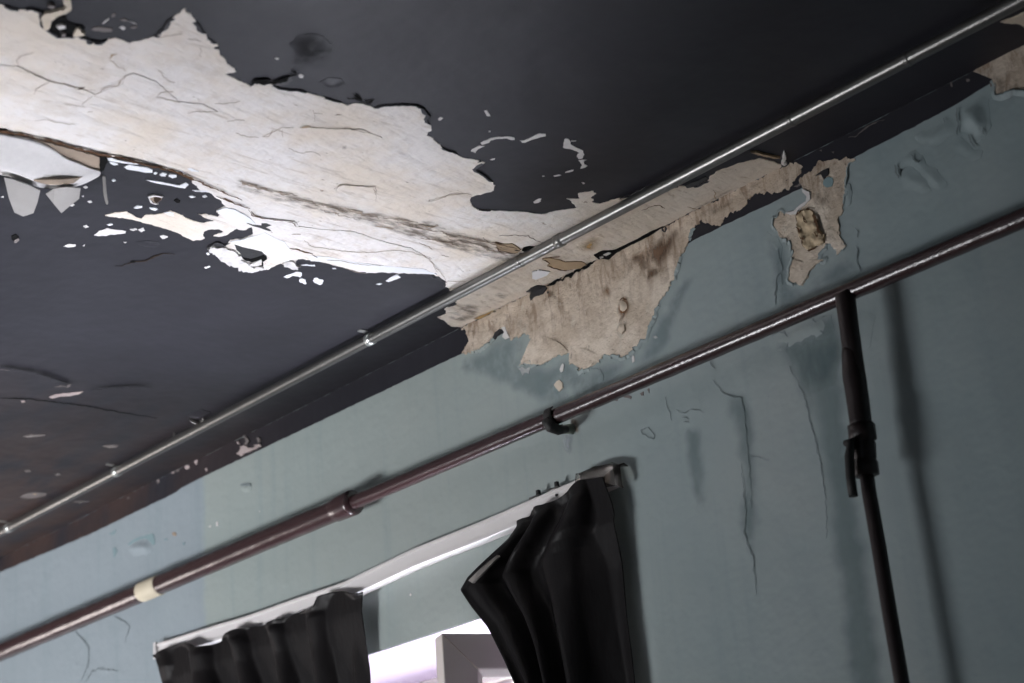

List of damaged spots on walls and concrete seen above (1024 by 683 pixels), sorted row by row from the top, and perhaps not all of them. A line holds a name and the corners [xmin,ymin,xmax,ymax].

peeling [966,45,1024,102]
peeling [0,4,855,392]
peeling [236,435,262,456]
crack [710,362,761,594]
crack [772,330,828,538]